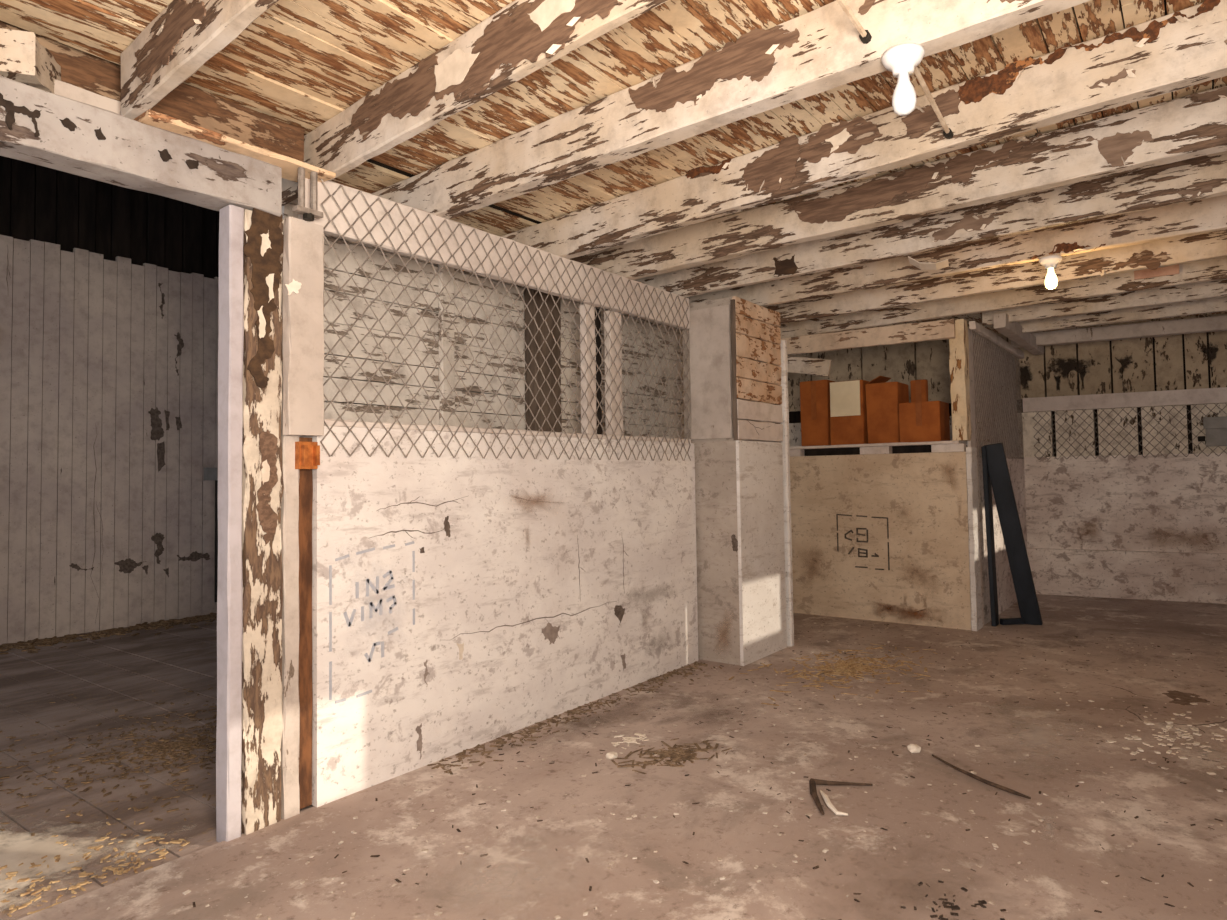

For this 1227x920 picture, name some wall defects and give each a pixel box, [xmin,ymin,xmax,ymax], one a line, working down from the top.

peeling [135,0,206,84]
peeling [351,0,623,140]
peeling [628,28,800,112]
peeling [901,0,1221,135]
peeling [685,117,883,194]
peeling [1086,130,1156,167]
peeling [243,208,302,388]
water stain [1017,364,1032,389]
water stain [1051,358,1094,390]
water stain [1117,356,1133,378]
water stain [1200,344,1218,377]
peeling [256,429,278,544]